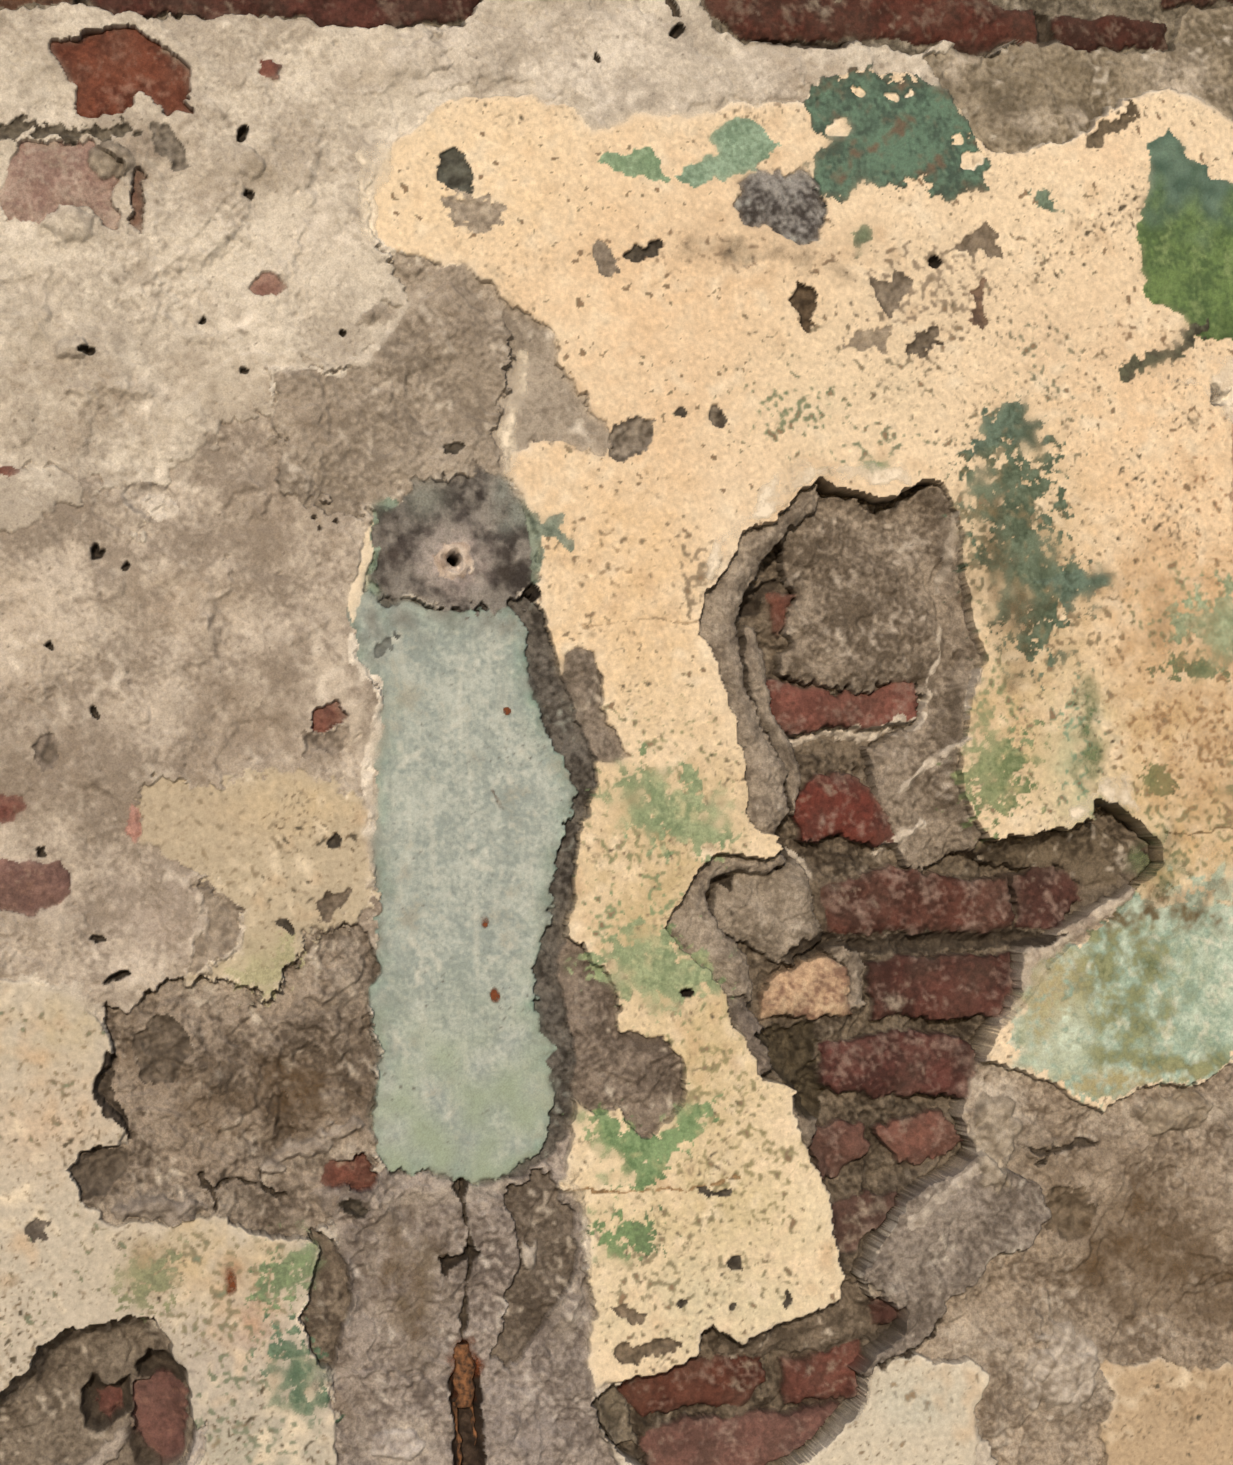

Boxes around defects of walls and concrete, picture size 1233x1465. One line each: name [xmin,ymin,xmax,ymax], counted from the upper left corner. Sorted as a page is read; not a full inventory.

flaking render [491,305,656,471]
peeling [956,400,1117,663]
flaking render [561,647,631,777]
peeling [613,763,742,865]
peeling [951,728,1046,829]
flaking render [557,924,727,1192]
peeling [1008,862,1233,1104]
crack [452,1178,476,1340]
peeling [697,1186,733,1198]
peeling [727,1256,744,1271]
spalling [0,1238,208,1465]
corrosion [450,1341,482,1465]